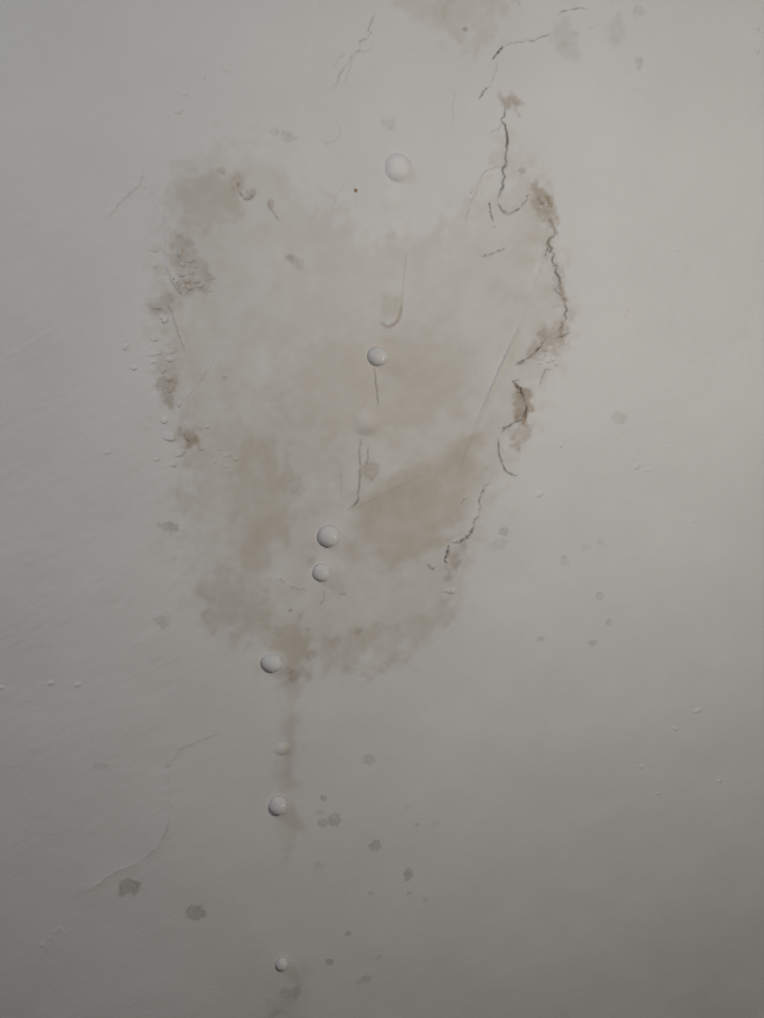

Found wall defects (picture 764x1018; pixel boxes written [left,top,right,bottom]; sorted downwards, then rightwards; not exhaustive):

crack [464,101,529,225]
crack [545,219,582,350]
water stain [118,111,595,873]
crack [425,377,529,575]